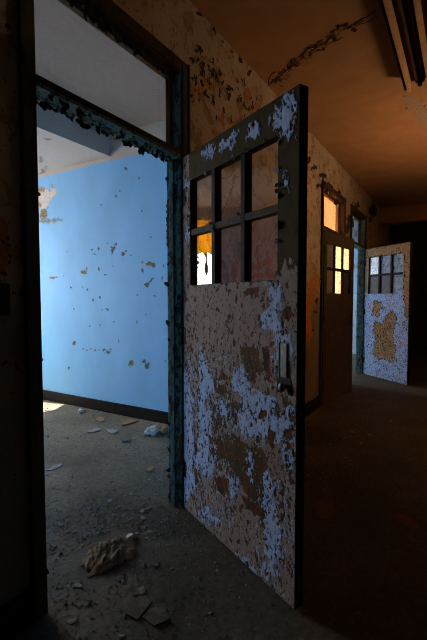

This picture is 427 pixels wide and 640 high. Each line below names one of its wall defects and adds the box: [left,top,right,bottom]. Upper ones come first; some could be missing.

crack [267,10,378,87]
peeling [36,45,300,608]
peeling [363,242,410,385]